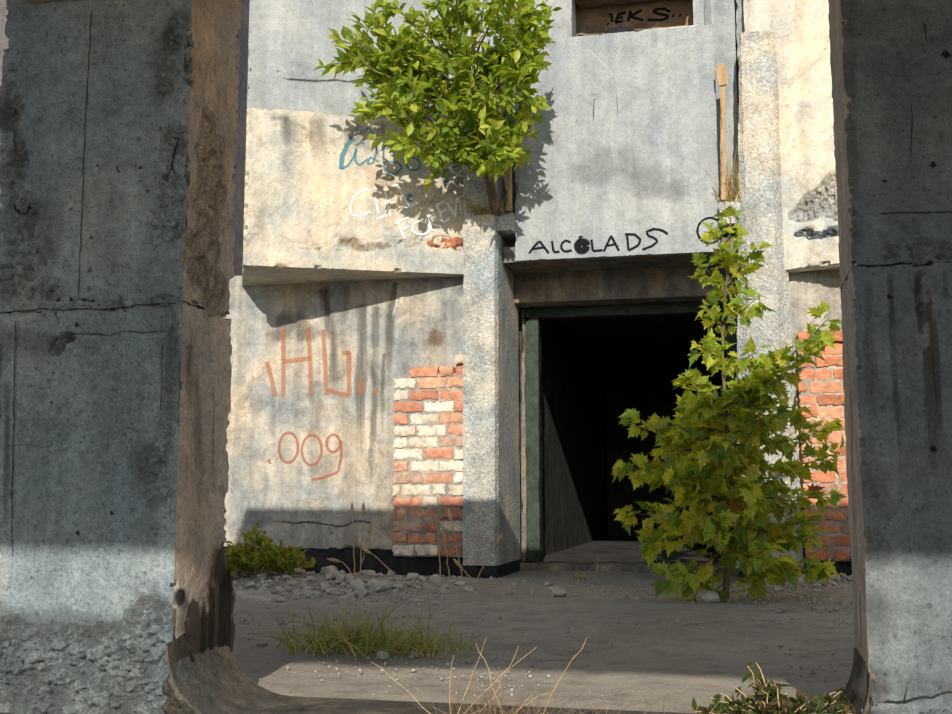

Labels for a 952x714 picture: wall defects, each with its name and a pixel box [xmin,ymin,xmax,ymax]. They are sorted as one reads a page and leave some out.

spalling [0,61,70,312]
spalling [47,322,79,357]
crack [0,12,192,574]
spalling [137,300,180,512]
spalling [148,105,229,319]
spalling [788,169,839,240]
crack [866,257,952,268]
crack [881,209,952,217]
spalling [0,542,236,714]
spalling [862,703,952,714]